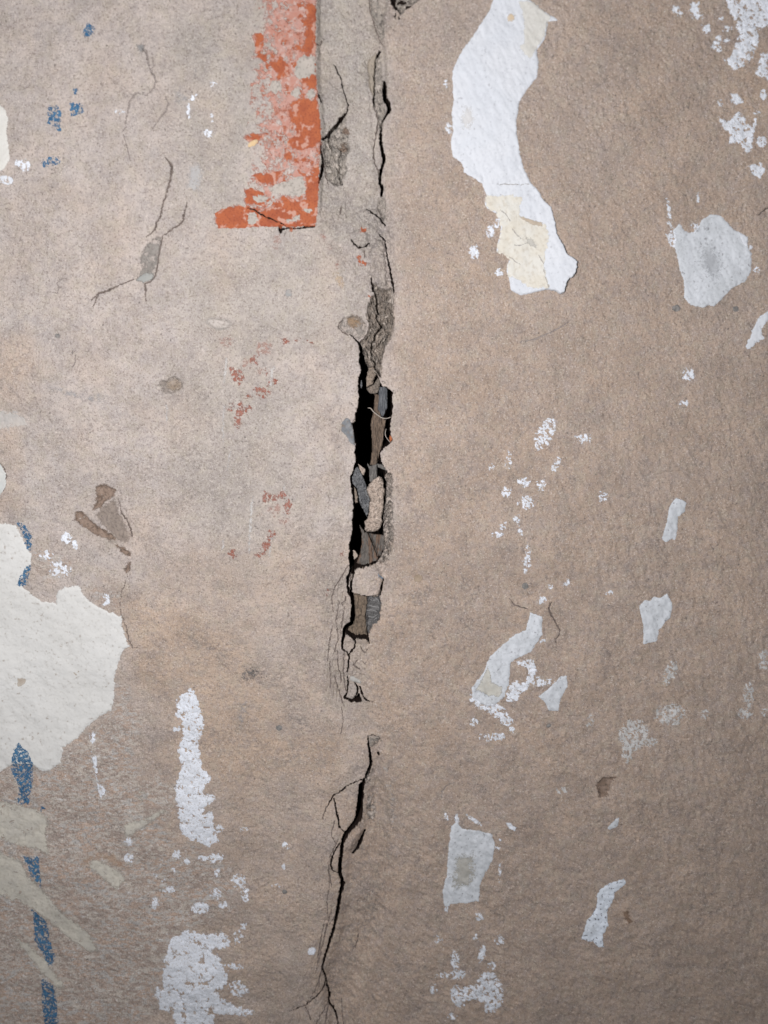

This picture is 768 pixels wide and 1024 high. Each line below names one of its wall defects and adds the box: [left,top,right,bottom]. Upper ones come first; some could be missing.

peeling [754,52,768,114]
crack [318,0,395,292]
peeling [665,198,677,249]
peeling [39,550,72,578]
peeling [60,531,78,550]
spalling [75,484,131,573]
crack [327,319,394,734]
peeling [469,659,555,741]
crack [289,734,380,1024]
peeling [212,923,247,945]
peeling [223,963,255,1017]